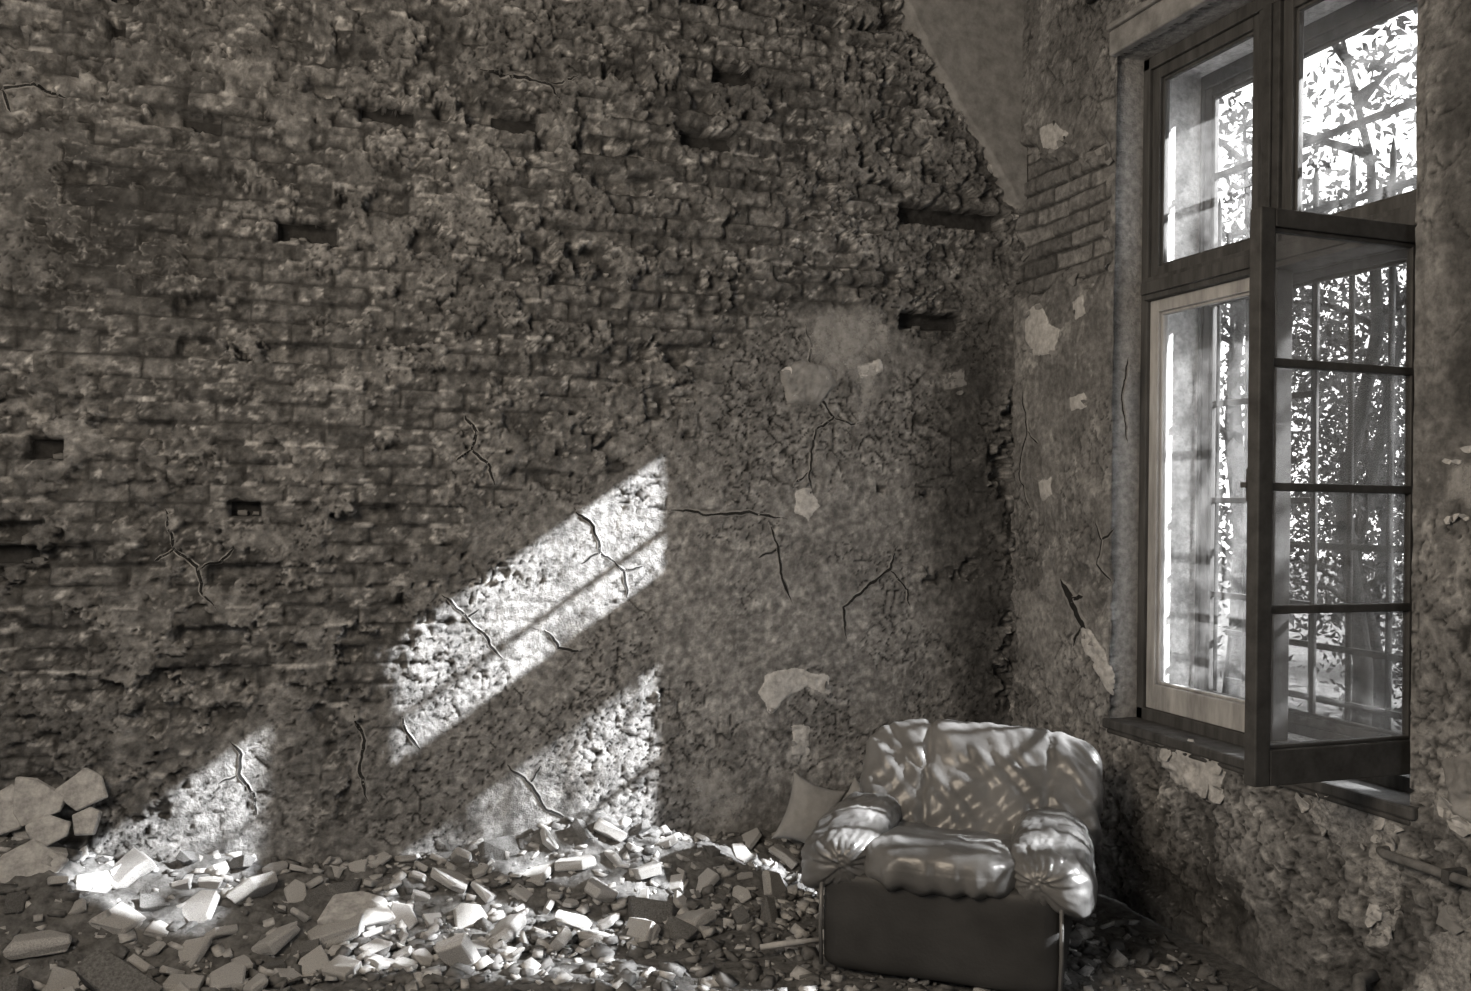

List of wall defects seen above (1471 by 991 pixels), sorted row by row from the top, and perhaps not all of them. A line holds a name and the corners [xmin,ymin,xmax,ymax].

spalling [360,108,414,128]
spalling [278,224,337,246]
peeling [812,313,956,419]
spalling [231,502,261,516]
crack [671,400,863,602]
flaking render [793,482,820,521]
crack [841,546,911,638]
crack [1060,521,1114,646]
flaking render [758,668,833,713]
flaking render [789,724,810,757]
crack [218,741,258,817]
flaking render [1416,905,1471,991]